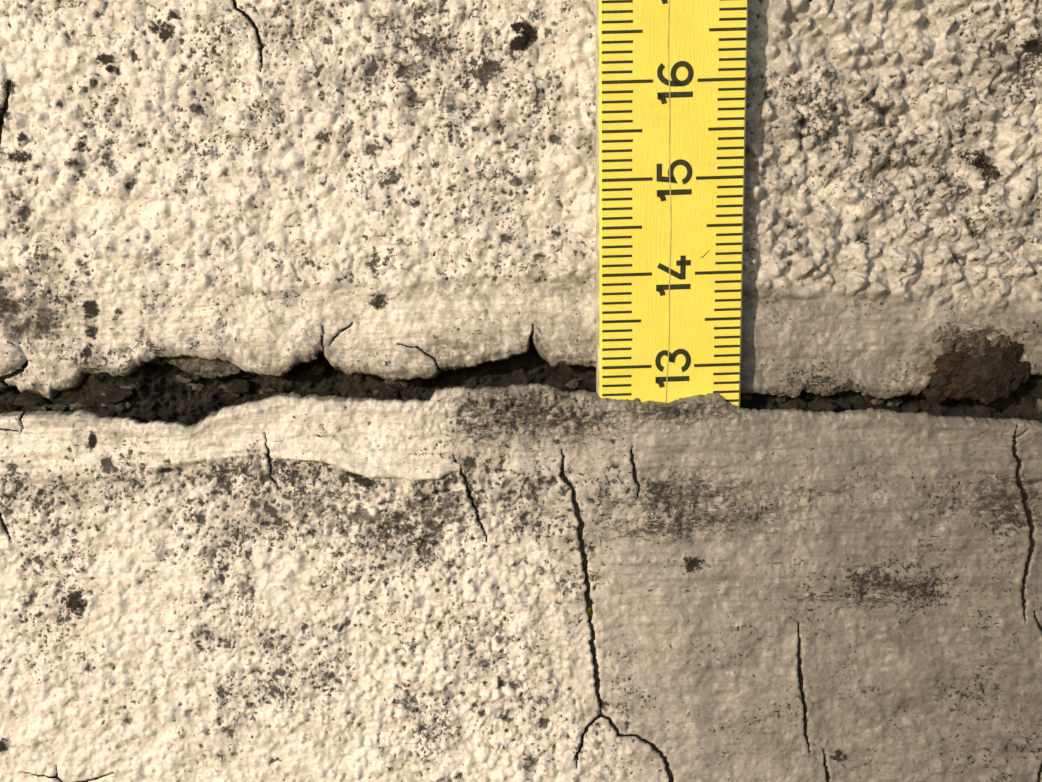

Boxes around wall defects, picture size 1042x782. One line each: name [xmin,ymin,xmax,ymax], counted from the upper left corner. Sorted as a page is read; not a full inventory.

crack [232,0,264,72]
crack [0,322,657,432]
corrosion [912,322,1031,405]
crack [0,512,12,543]
crack [453,455,487,543]
crack [732,375,1042,632]
crack [560,446,674,782]
crack [797,622,830,782]
crack [21,765,113,782]